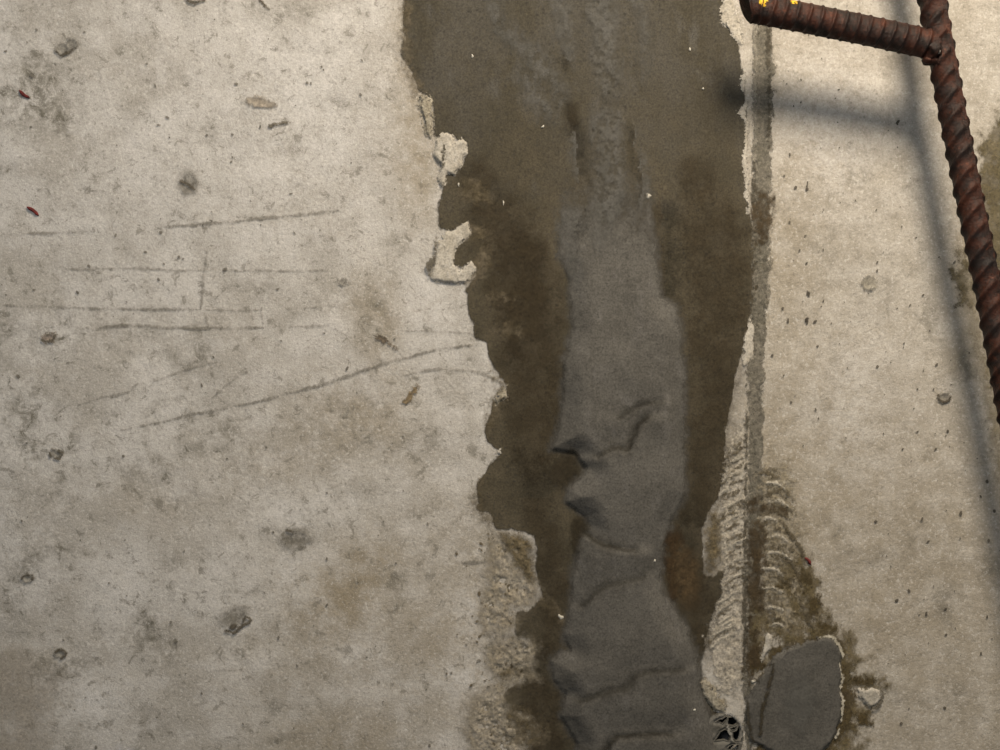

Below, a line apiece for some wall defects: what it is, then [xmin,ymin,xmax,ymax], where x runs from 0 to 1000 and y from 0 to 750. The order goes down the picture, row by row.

leakage [401,0,758,750]
rust [949,250,977,320]
leakage [978,119,1000,270]
leakage [746,556,889,750]